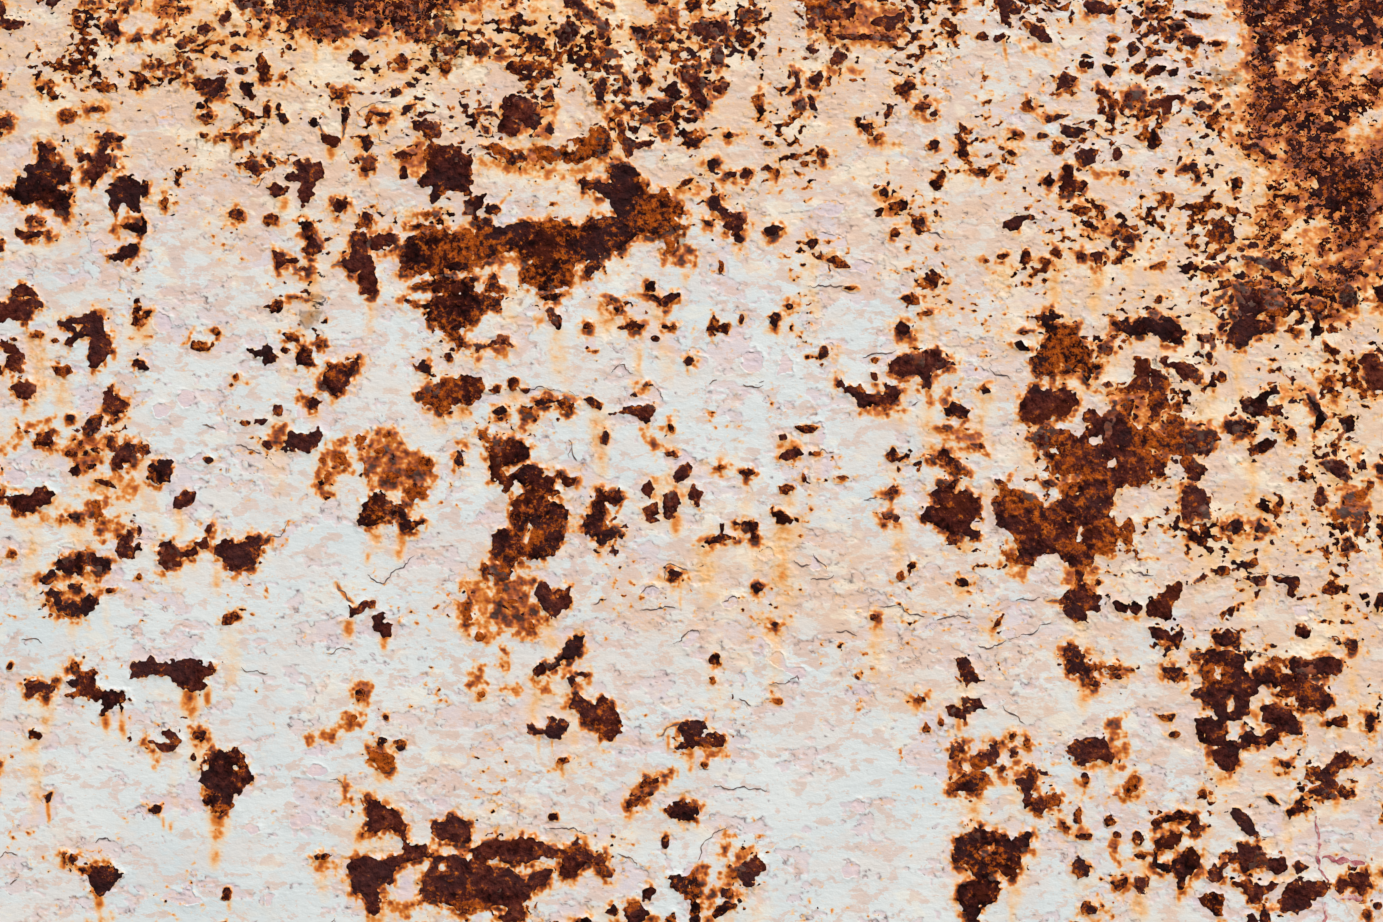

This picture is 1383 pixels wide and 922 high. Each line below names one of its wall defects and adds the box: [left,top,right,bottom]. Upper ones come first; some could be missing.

rust [193,189,256,266]
rust [839,283,862,293]
rust [162,320,242,363]
rust [199,445,232,480]
rust [338,650,453,757]
rust [131,800,174,836]
rust [153,853,253,922]
rust [767,885,886,922]